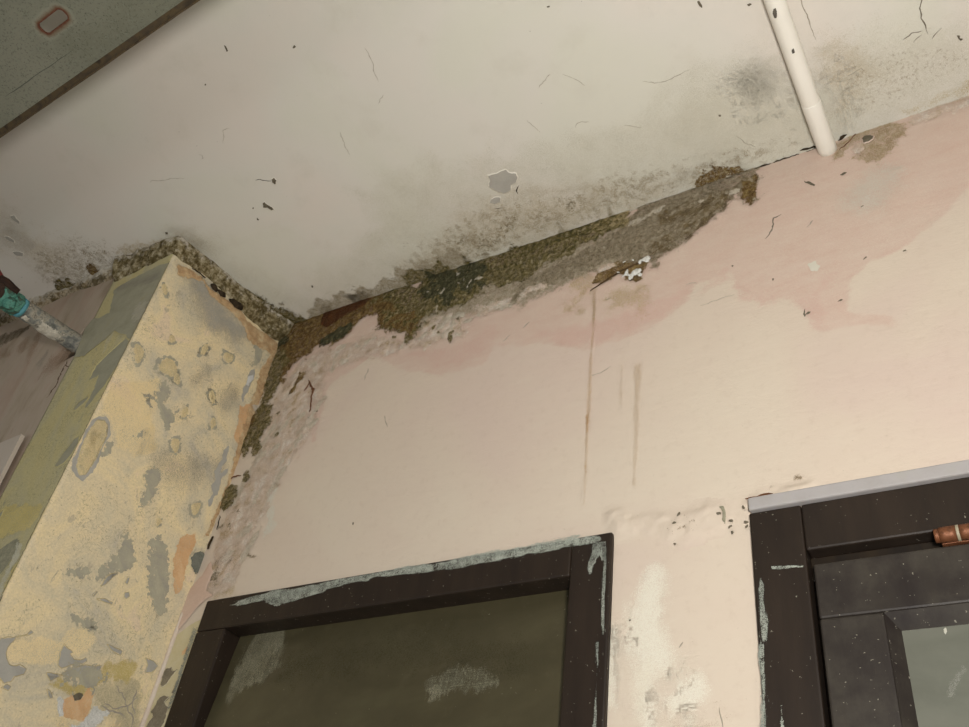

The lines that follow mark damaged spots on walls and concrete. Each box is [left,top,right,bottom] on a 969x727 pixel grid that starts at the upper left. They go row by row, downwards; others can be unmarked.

crack [903,0,937,40]
peeling [487,169,519,209]
damp [0,5,969,457]
peeling [407,281,548,346]
flaking render [555,238,677,321]
peeling [46,263,328,727]
damp [145,434,250,549]
peeling [0,630,34,691]